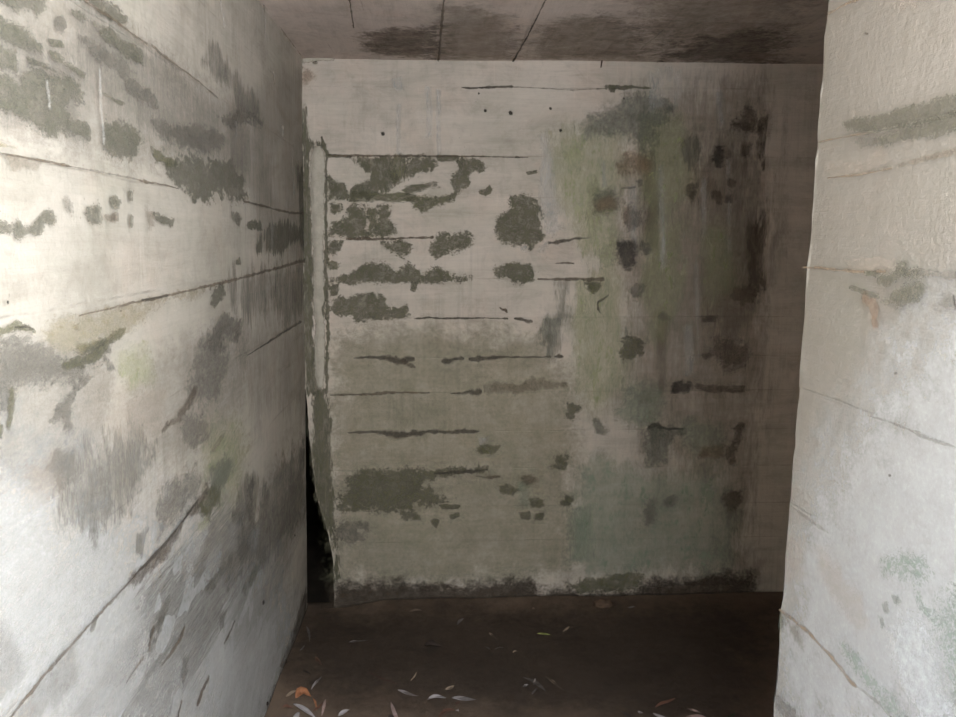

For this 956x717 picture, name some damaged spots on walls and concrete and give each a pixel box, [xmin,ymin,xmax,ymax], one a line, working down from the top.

damp [363,26,439,59]
crack [512,0,546,62]
damp [0,0,304,256]
crack [462,83,544,91]
damp [842,93,956,147]
damp [571,85,699,273]
damp [321,153,486,323]
damp [849,281,928,309]
damp [593,331,645,406]
damp [671,381,741,394]
damp [0,388,775,717]
damp [774,330,956,717]